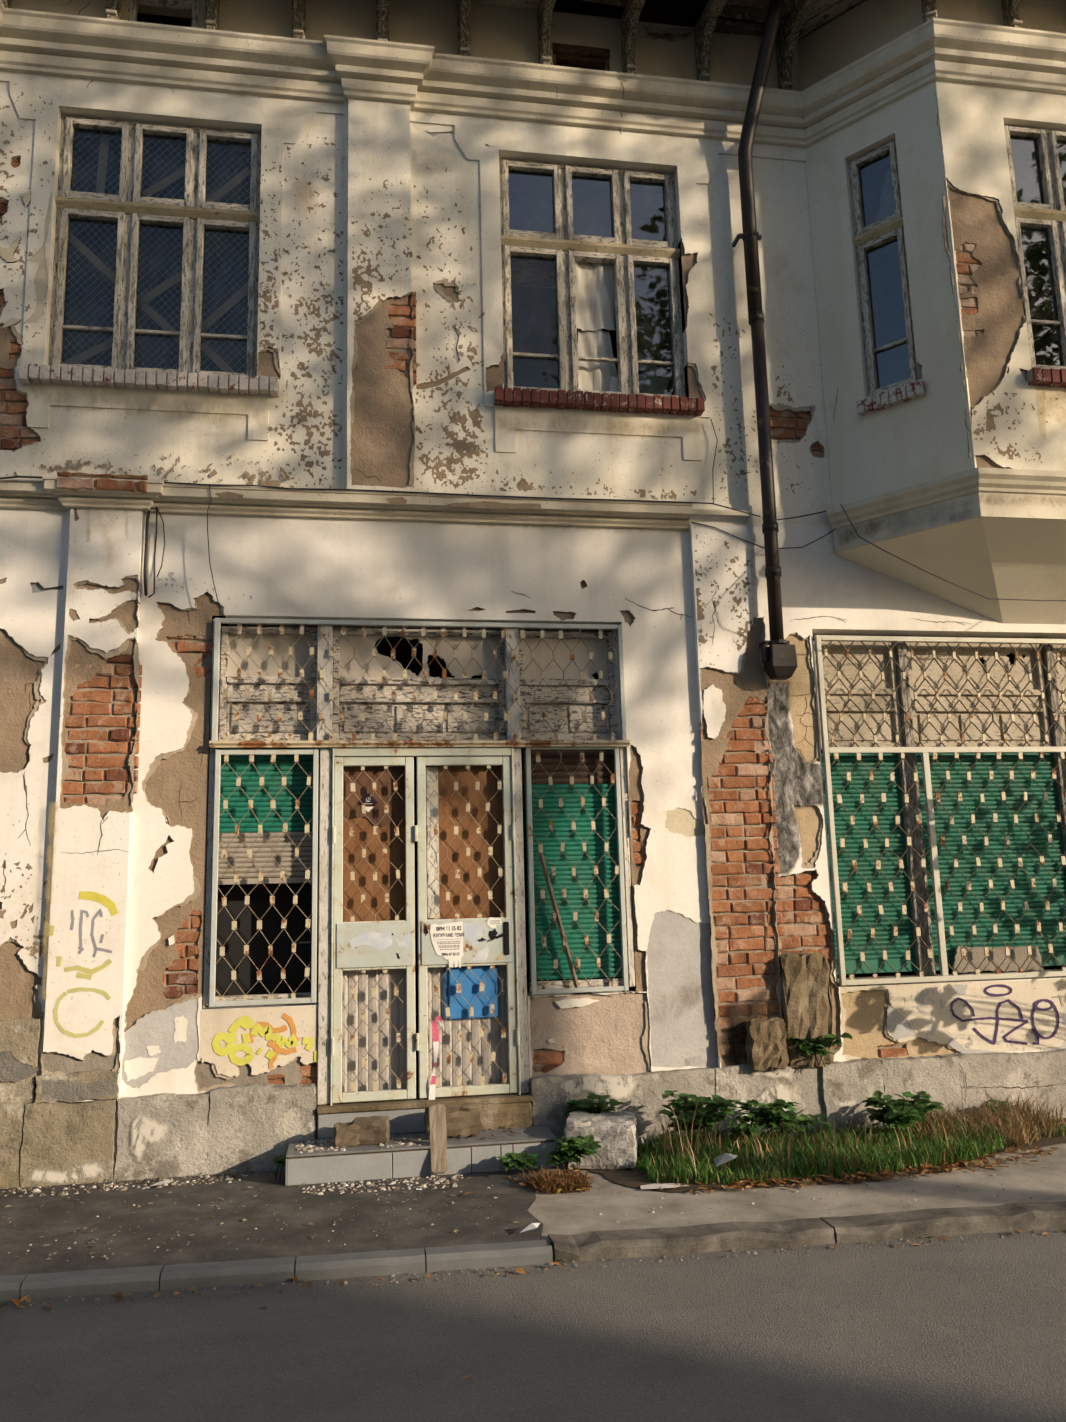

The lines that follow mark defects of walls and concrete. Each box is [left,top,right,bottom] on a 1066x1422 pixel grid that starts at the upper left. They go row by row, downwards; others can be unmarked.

flaking render [0,84,54,452]
flaking render [6,137,824,510]
flaking render [942,179,1061,469]
flaking render [0,572,317,1103]
flaking render [530,535,1066,1132]